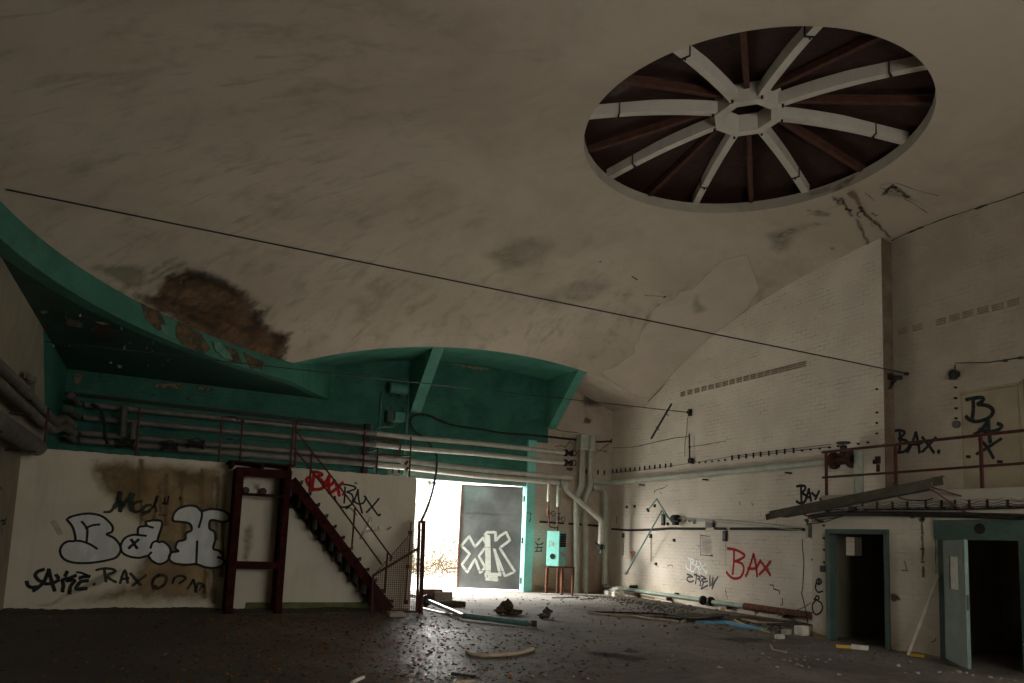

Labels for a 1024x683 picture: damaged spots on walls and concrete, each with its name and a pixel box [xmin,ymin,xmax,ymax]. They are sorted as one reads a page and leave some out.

peeling [141,303,263,369]
water stain [96,459,225,603]